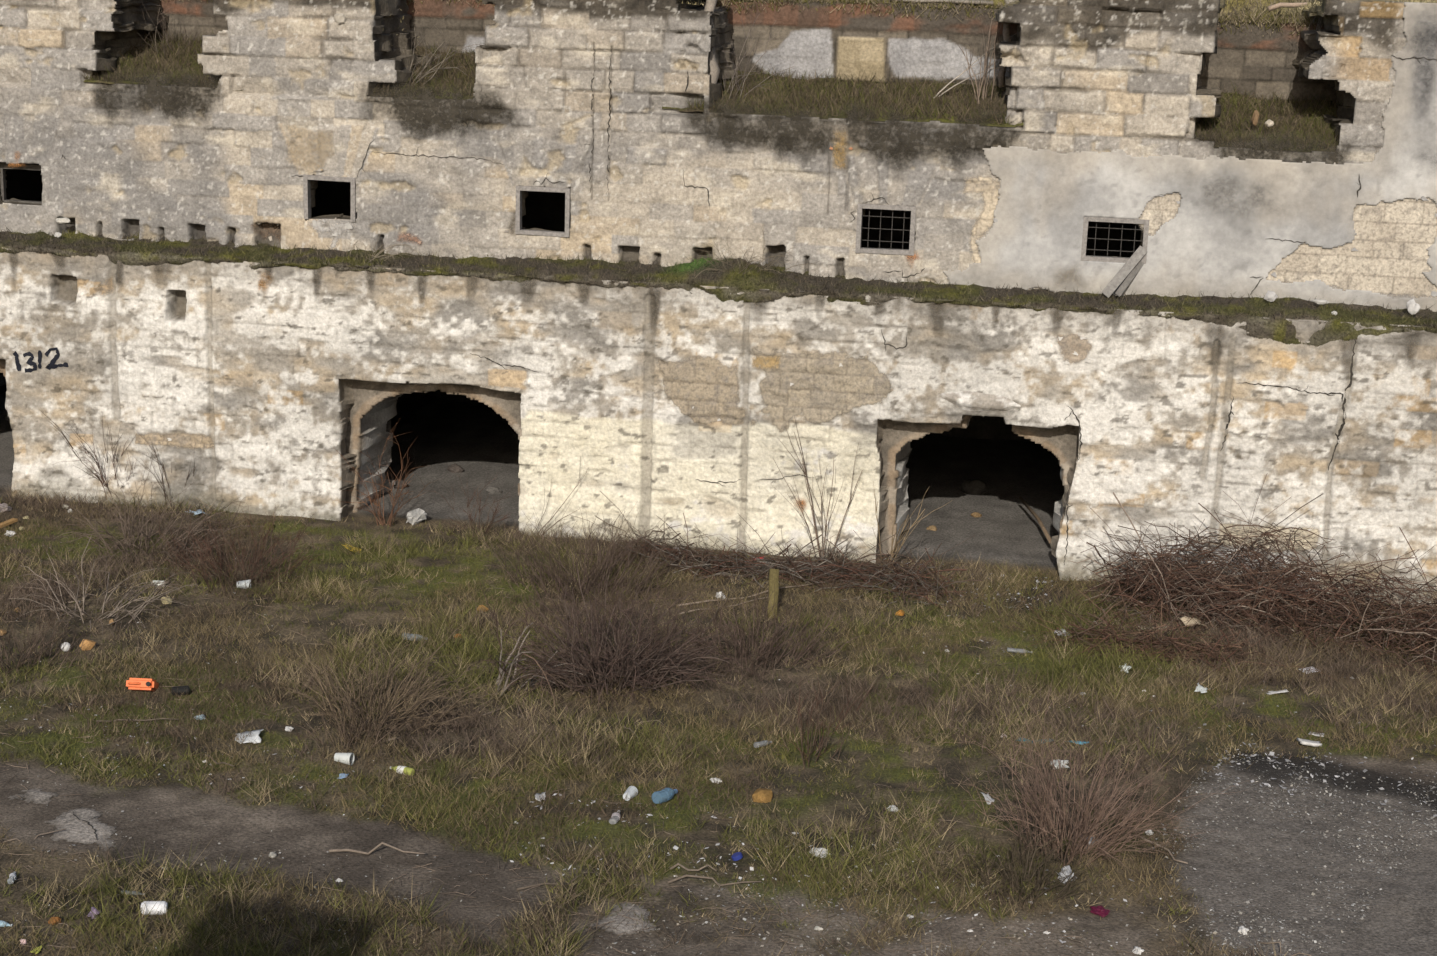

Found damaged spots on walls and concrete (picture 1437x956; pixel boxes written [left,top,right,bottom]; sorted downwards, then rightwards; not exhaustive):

peeling [1266,196,1437,298]
crack [1221,340,1356,471]